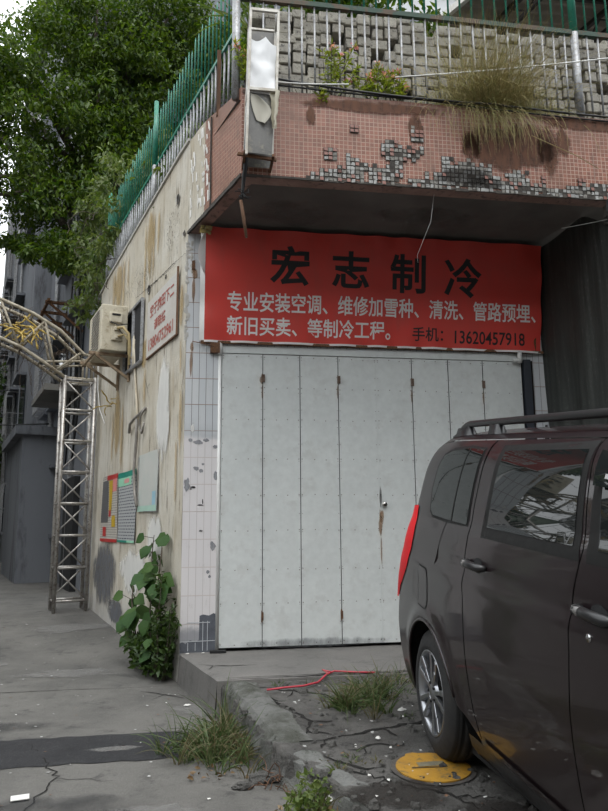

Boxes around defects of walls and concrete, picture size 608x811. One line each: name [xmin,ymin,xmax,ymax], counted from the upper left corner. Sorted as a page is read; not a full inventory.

spalling [306,125,608,200]